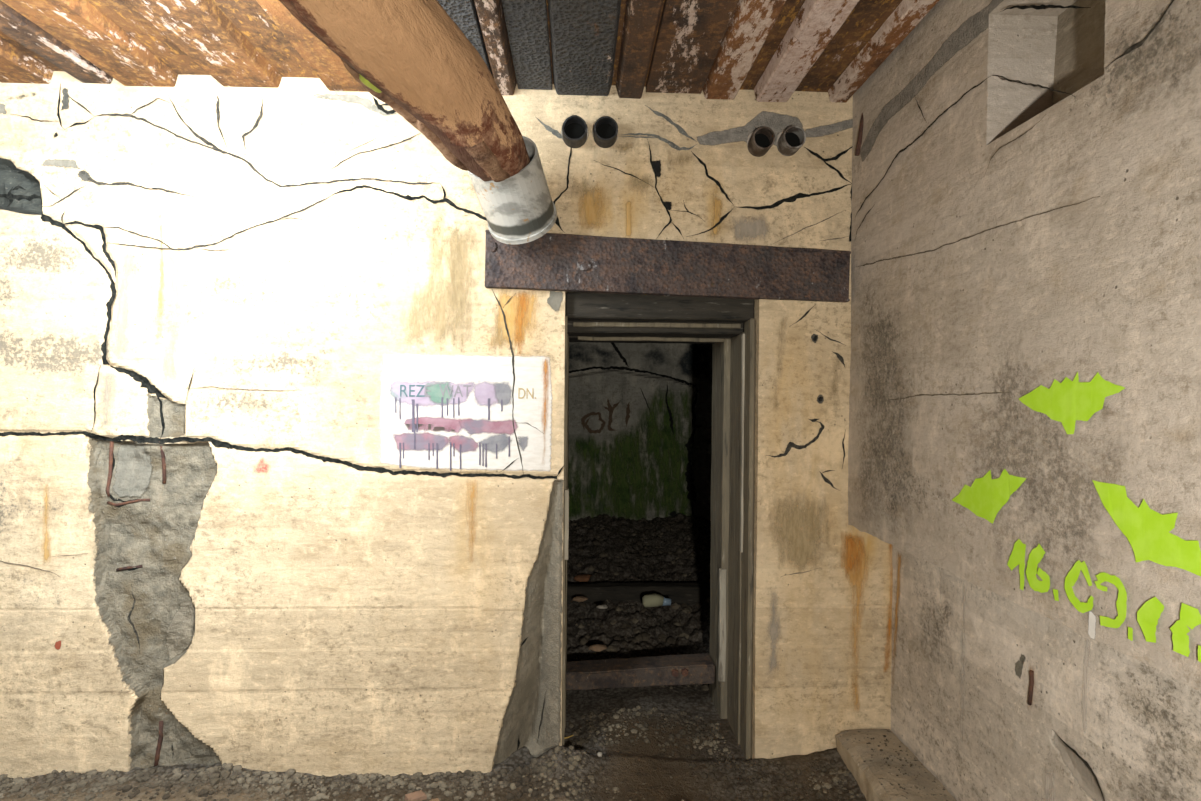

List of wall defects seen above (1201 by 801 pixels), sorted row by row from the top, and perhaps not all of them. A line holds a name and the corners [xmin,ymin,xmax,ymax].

crack [1001,4,1091,12]
crack [1104,0,1174,69]
spalling [0,158,92,215]
crack [537,75,1100,267]
crack [0,84,565,479]
crack [569,343,701,517]
crack [768,419,846,490]
crack [885,392,1010,401]
spalling [87,394,222,770]
corrosion [843,536,866,653]
corrosion [884,544,901,671]
spalling [1052,729,1105,801]